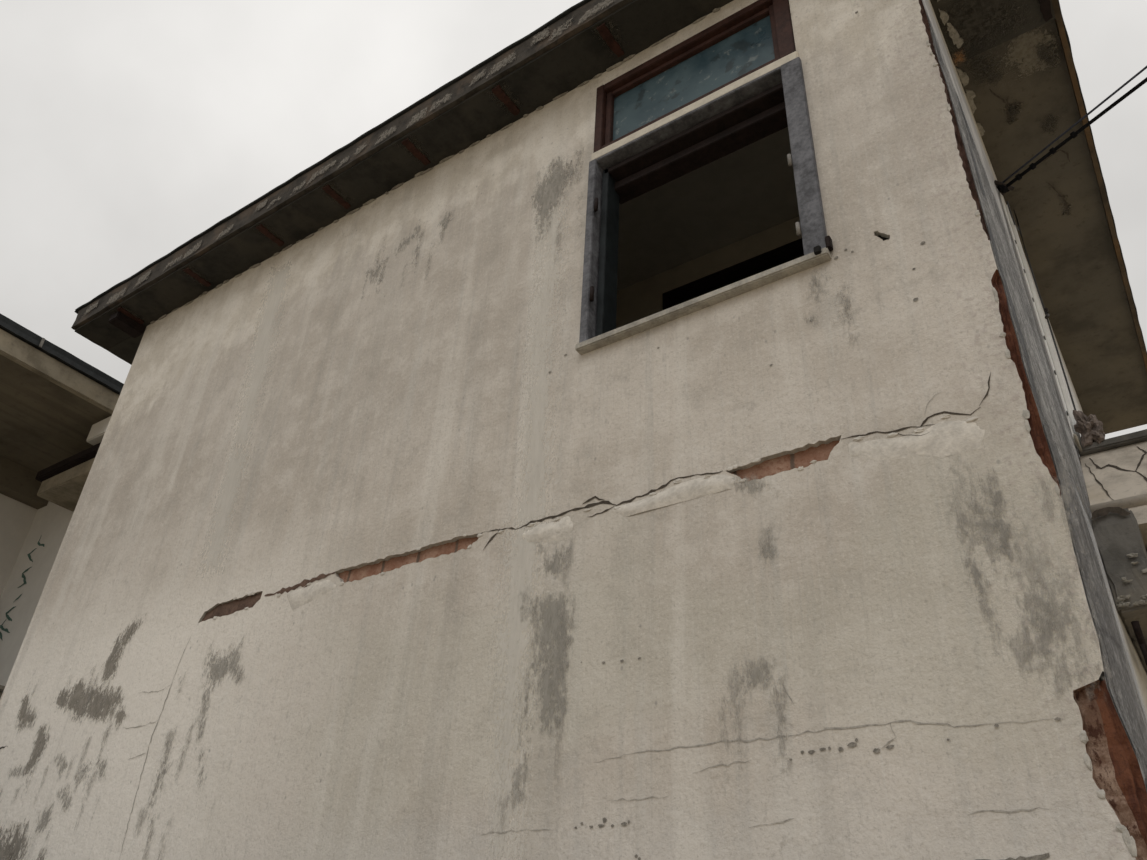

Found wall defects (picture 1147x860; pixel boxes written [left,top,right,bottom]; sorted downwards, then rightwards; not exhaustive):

flaking render [937,0,964,48]
flaking render [955,67,985,137]
leakage [926,0,1147,783]
leakage [487,157,573,860]
crack [483,471,722,550]
crack [1085,446,1147,520]
crack [265,572,335,597]
leakage [56,620,141,726]
leakage [9,696,49,776]
crack [594,718,1055,773]
spalling [1073,680,1147,860]
leakage [0,787,71,860]